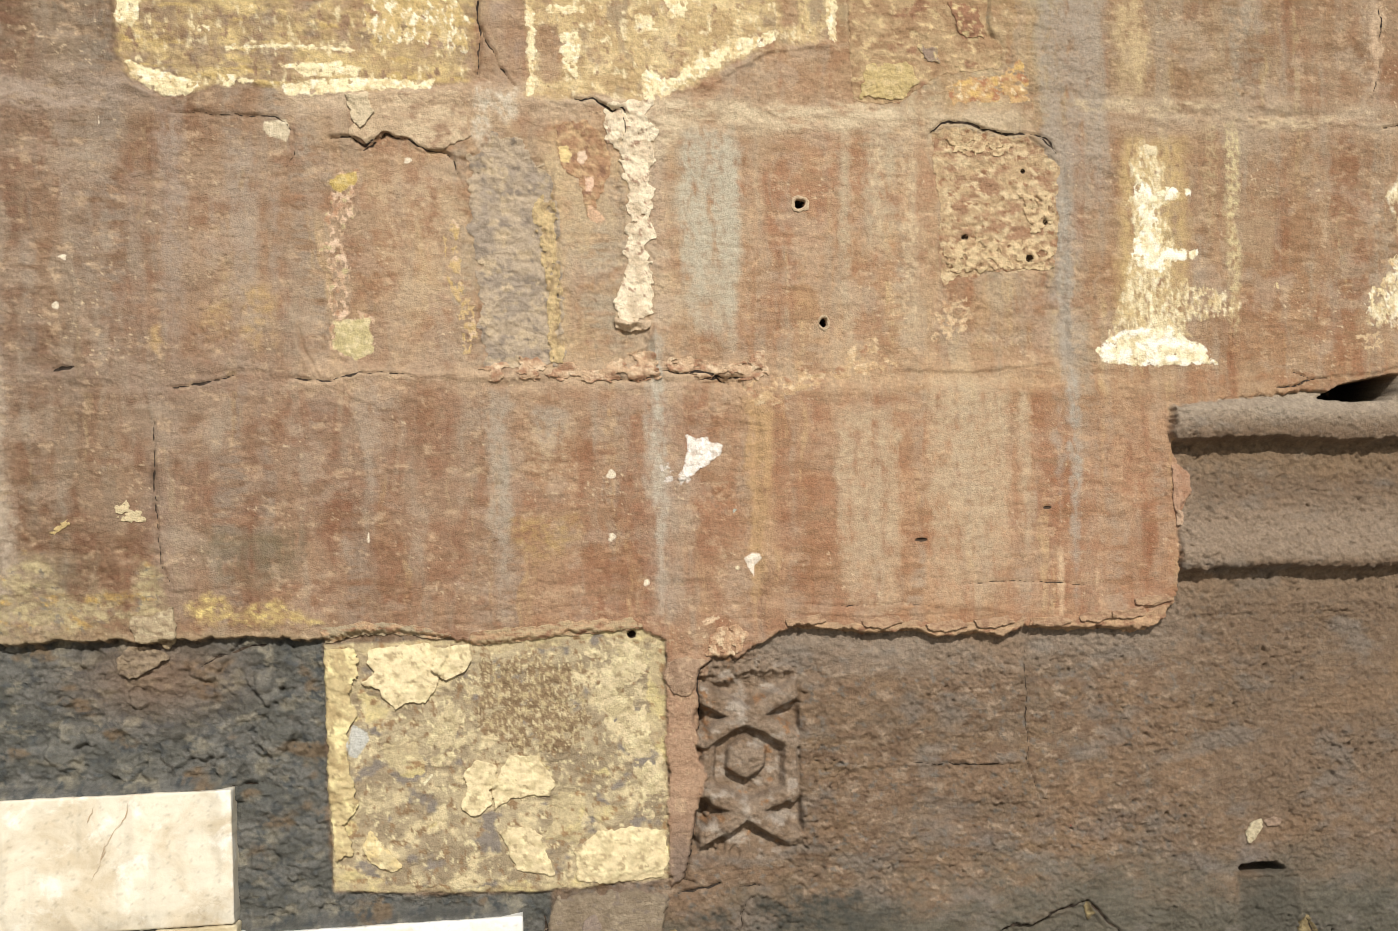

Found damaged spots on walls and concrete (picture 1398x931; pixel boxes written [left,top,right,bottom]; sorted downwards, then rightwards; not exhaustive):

crack [179,112,295,167]
crack [340,133,458,174]
peeling [110,0,1030,406]
peeling [1384,173,1398,234]
peeling [1095,137,1259,368]
peeling [1355,254,1398,352]
crack [1277,372,1325,388]
peeling [114,500,146,523]
peeling [0,520,749,931]
crack [1002,900,1120,931]